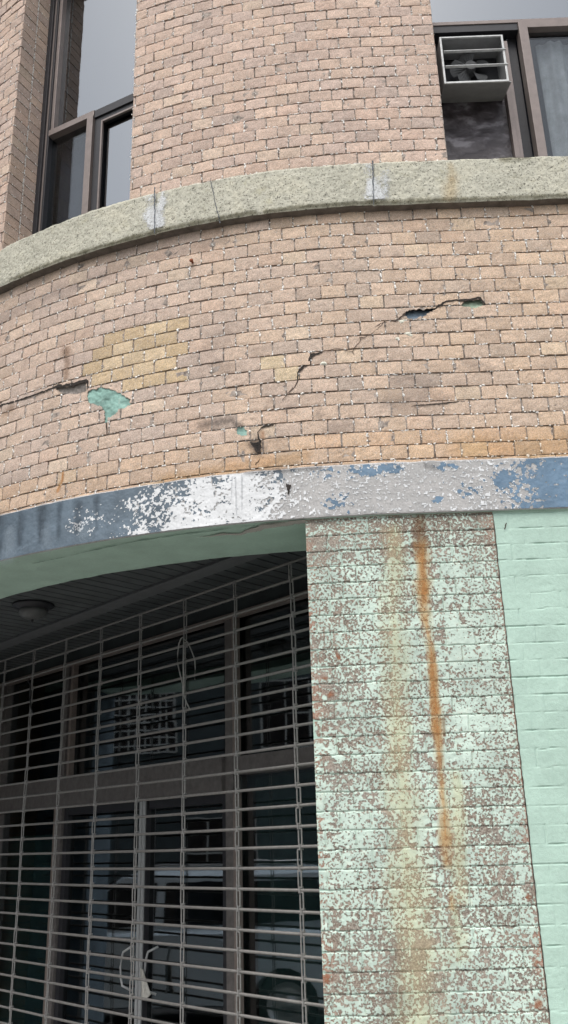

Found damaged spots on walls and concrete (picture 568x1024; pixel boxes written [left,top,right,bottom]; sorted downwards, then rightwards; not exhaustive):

crack [437,297,486,307]
crack [282,313,405,400]
crack [0,379,89,407]
spalling [57,382,131,423]
spalling [236,427,262,455]
crack [255,424,274,465]
rust [415,543,451,866]
peeling [0,457,568,1024]